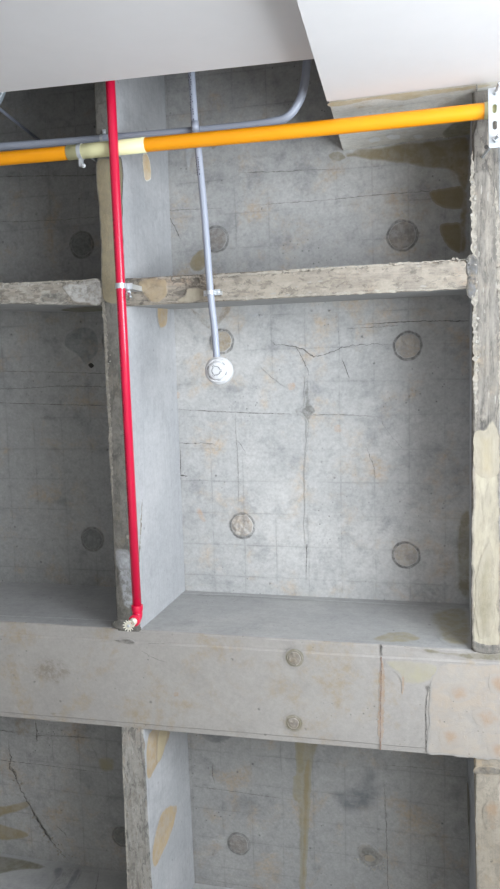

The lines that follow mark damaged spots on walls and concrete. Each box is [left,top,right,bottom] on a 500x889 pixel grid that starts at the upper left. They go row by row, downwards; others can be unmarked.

water stain [328,121,471,255]
crack [178,309,471,570]
water stain [473,426,500,478]
water stain [428,508,495,647]
water stain [0,800,32,841]
water stain [0,855,47,874]
crack [0,720,108,859]
water stain [146,730,170,780]
water stain [152,804,177,868]
water stain [291,742,319,889]